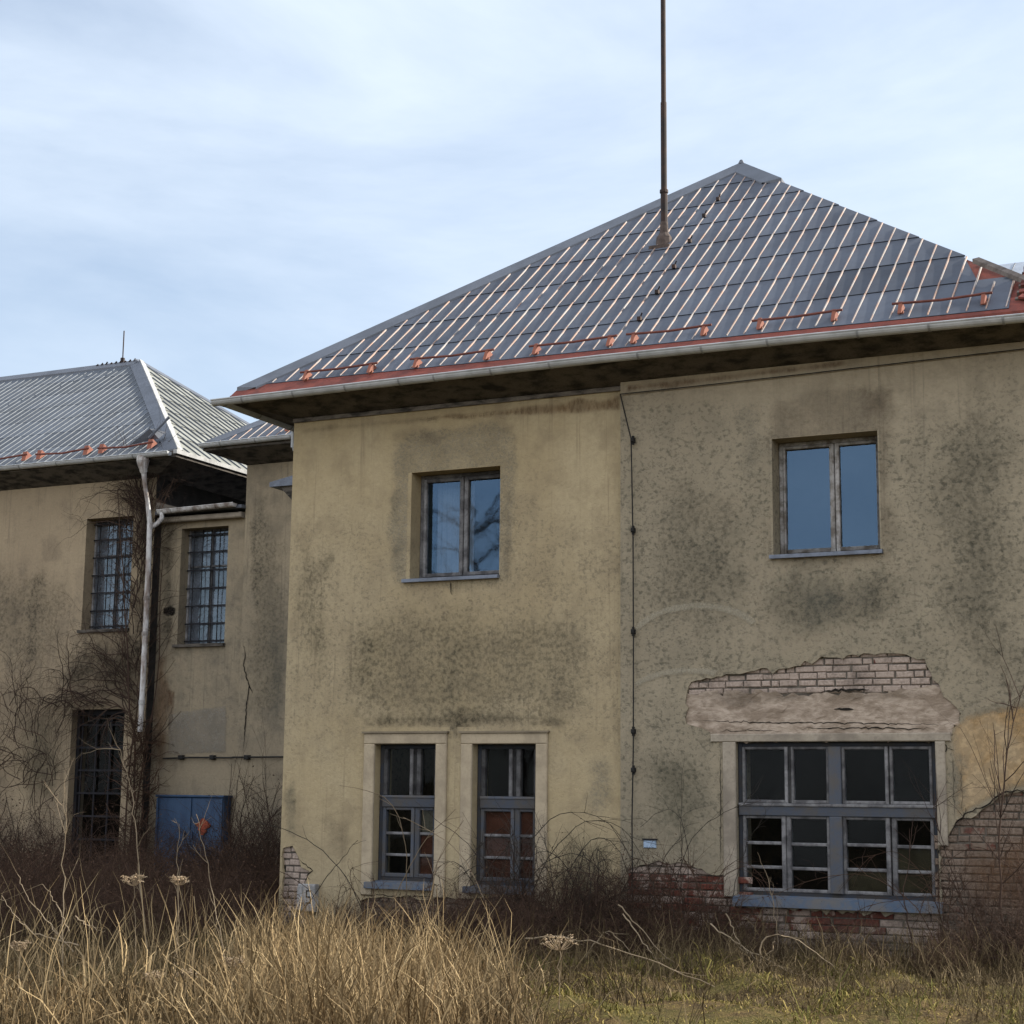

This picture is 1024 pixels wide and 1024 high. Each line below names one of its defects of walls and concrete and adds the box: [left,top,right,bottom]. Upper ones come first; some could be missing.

crack [243,646,252,750]
flaking render [626,653,1024,958]
flaking render [281,846,309,926]